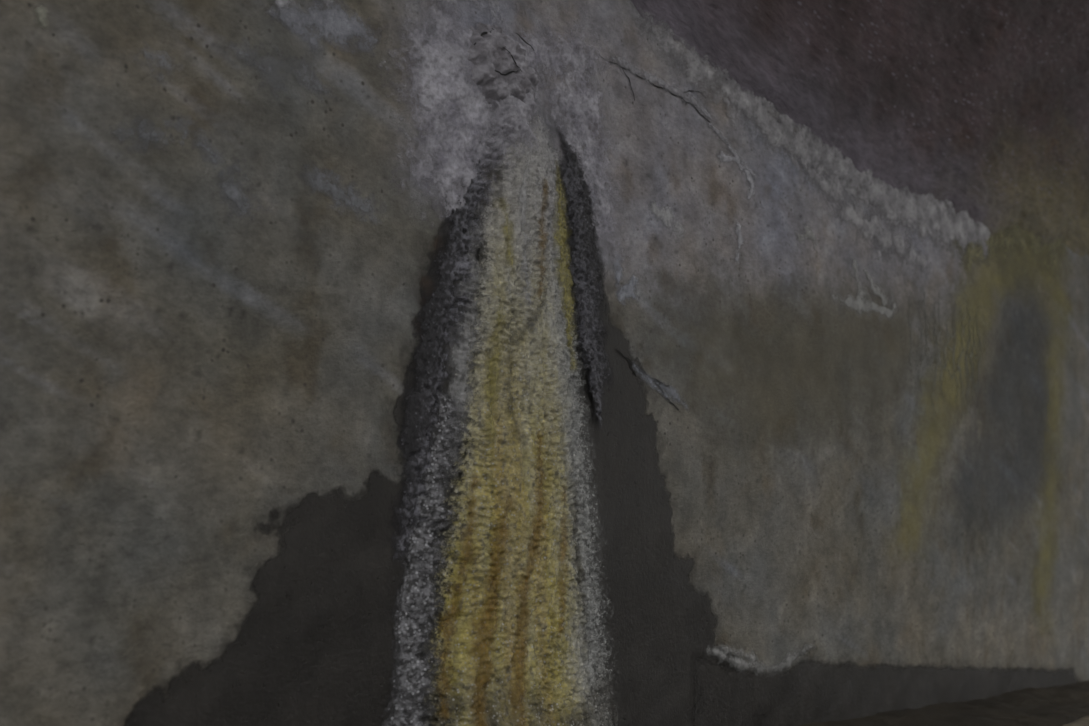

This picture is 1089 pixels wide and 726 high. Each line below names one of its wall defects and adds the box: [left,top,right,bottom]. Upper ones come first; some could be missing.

crack [599,54,728,144]
damp [612,12,1066,287]
damp [832,260,896,317]
damp [125,0,737,726]
damp [692,657,1078,726]